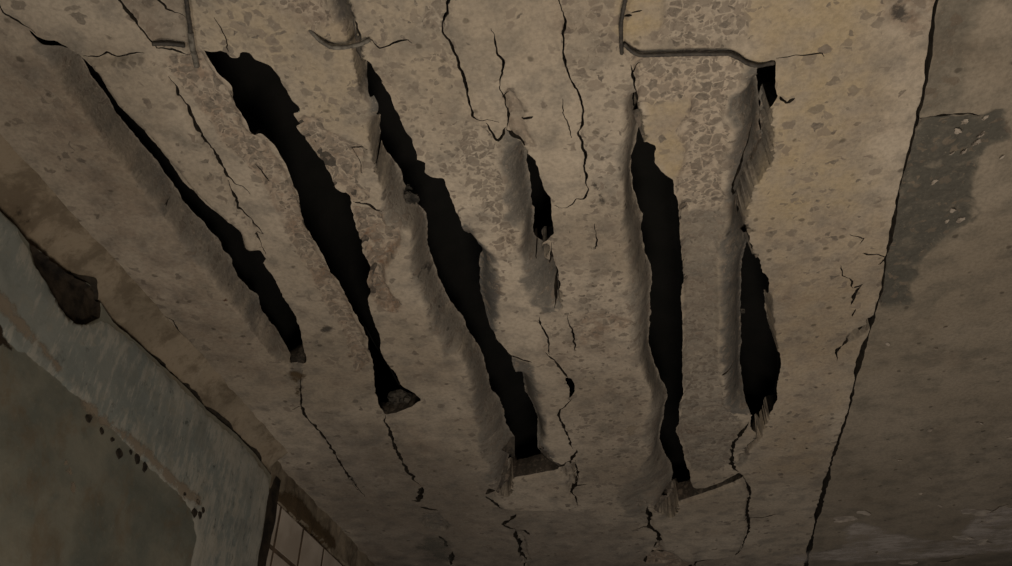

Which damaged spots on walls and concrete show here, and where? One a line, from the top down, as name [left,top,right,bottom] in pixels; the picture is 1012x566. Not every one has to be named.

crack [442,0,533,146]
crack [555,0,589,208]
crack [917,111,979,119]
peeling [0,212,269,566]
peeling [29,0,586,512]
crack [292,370,365,497]
crack [383,415,438,511]
crack [486,497,530,566]
crack [509,228,586,505]
crack [638,506,664,562]
crack [728,422,775,555]
crack [835,268,874,359]